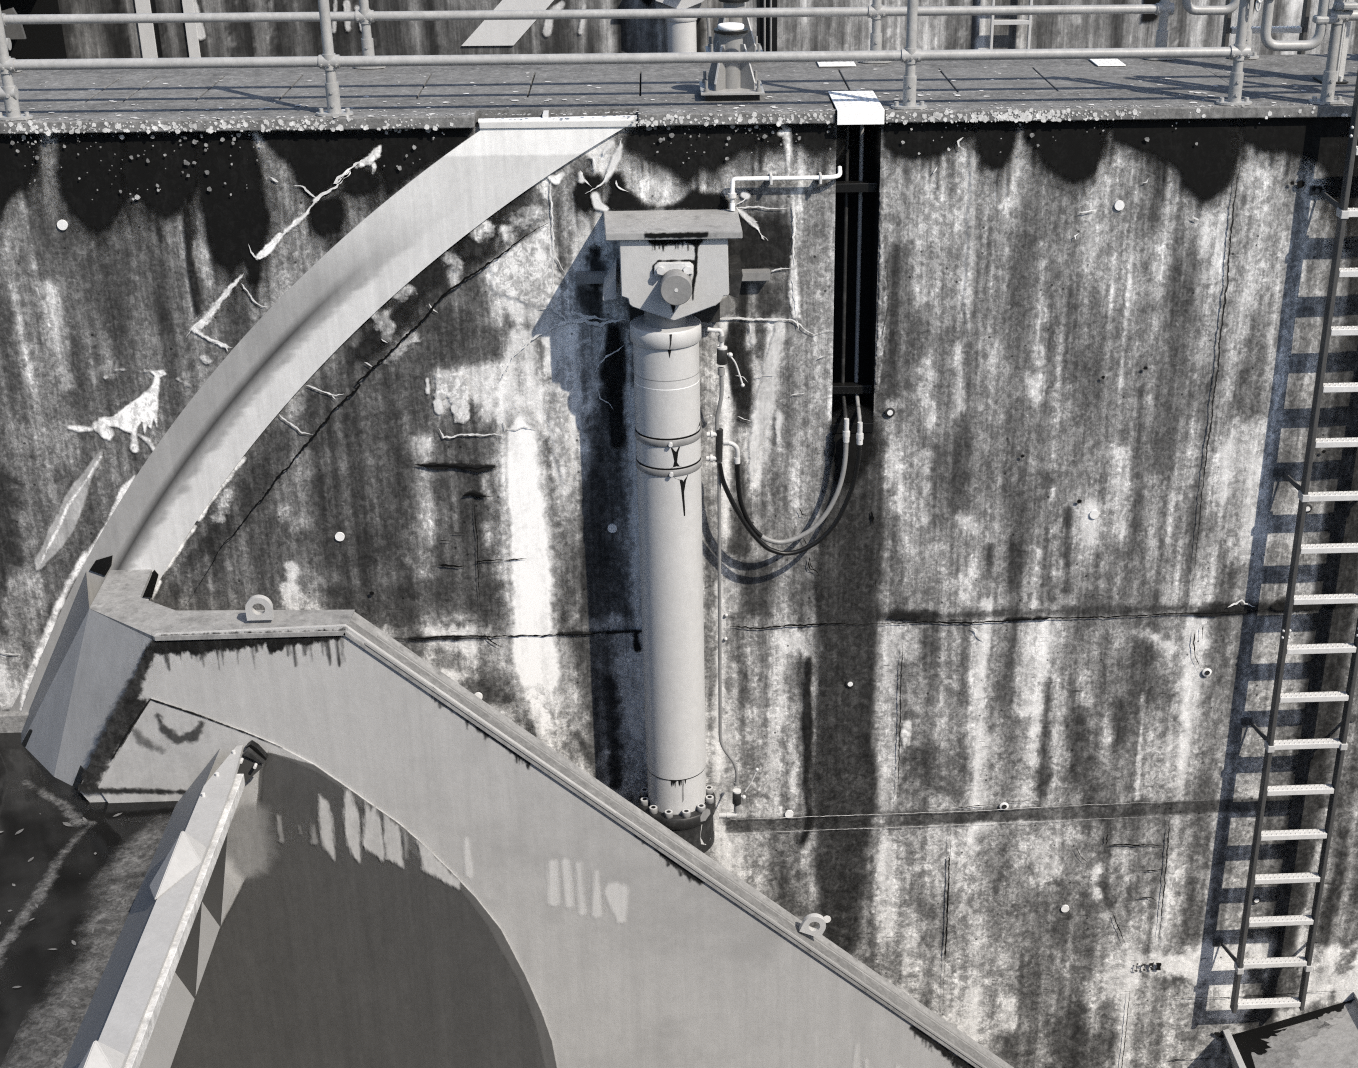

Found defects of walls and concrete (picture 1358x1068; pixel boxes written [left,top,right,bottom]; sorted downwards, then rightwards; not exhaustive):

damp [0,134,43,219]
damp [56,128,472,314]
damp [20,476,135,710]
spalling [35,370,191,570]
damp [152,457,246,599]
crack [187,141,630,603]
damp [497,357,572,753]
damp [602,327,626,449]
damp [720,297,784,481]
damp [798,408,883,953]
crack [720,151,1358,1013]
damp [883,117,1358,1037]